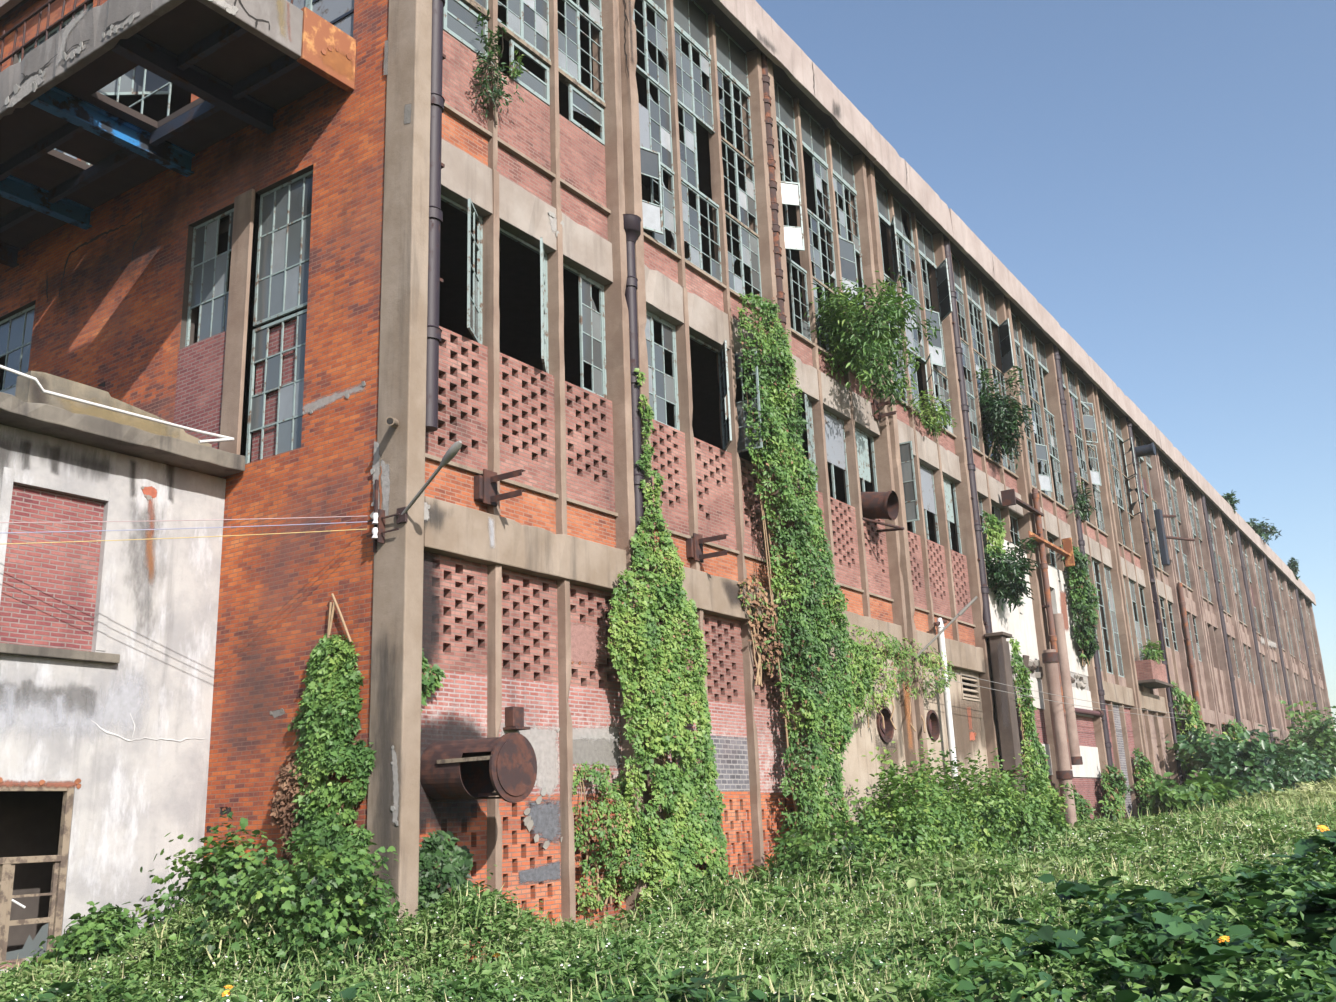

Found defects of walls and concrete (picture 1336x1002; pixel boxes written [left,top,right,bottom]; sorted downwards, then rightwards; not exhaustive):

spalling [102,11,140,38]
spalling [208,0,238,15]
spalling [62,42,86,61]
spalling [4,69,45,109]
damp [0,439,109,473]
damp [131,512,151,614]
spalling [519,781,563,884]